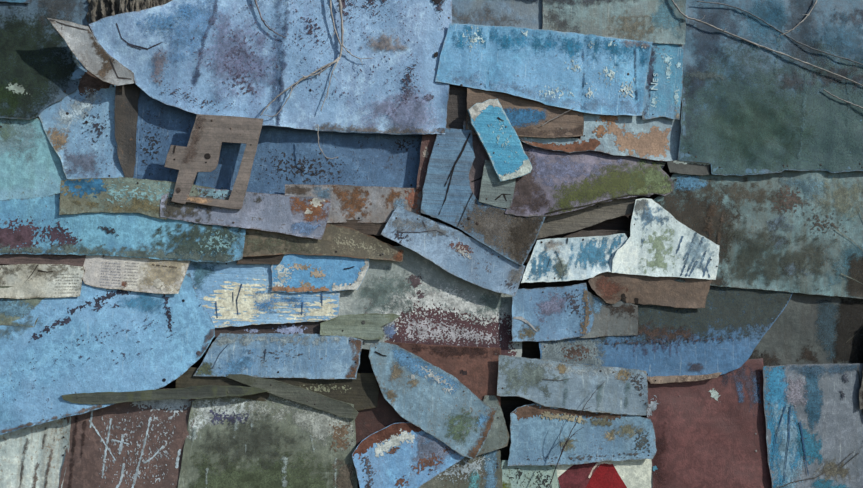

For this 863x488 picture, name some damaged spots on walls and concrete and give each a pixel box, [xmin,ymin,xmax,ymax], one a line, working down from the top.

peeling [469,99,710,181]
corrosion [253,147,372,224]
corrosion [510,151,550,214]
corrosion [382,189,454,260]
peeling [202,235,396,334]
corrosion [403,274,425,299]
corrosion [410,173,863,405]
peeling [353,423,424,459]